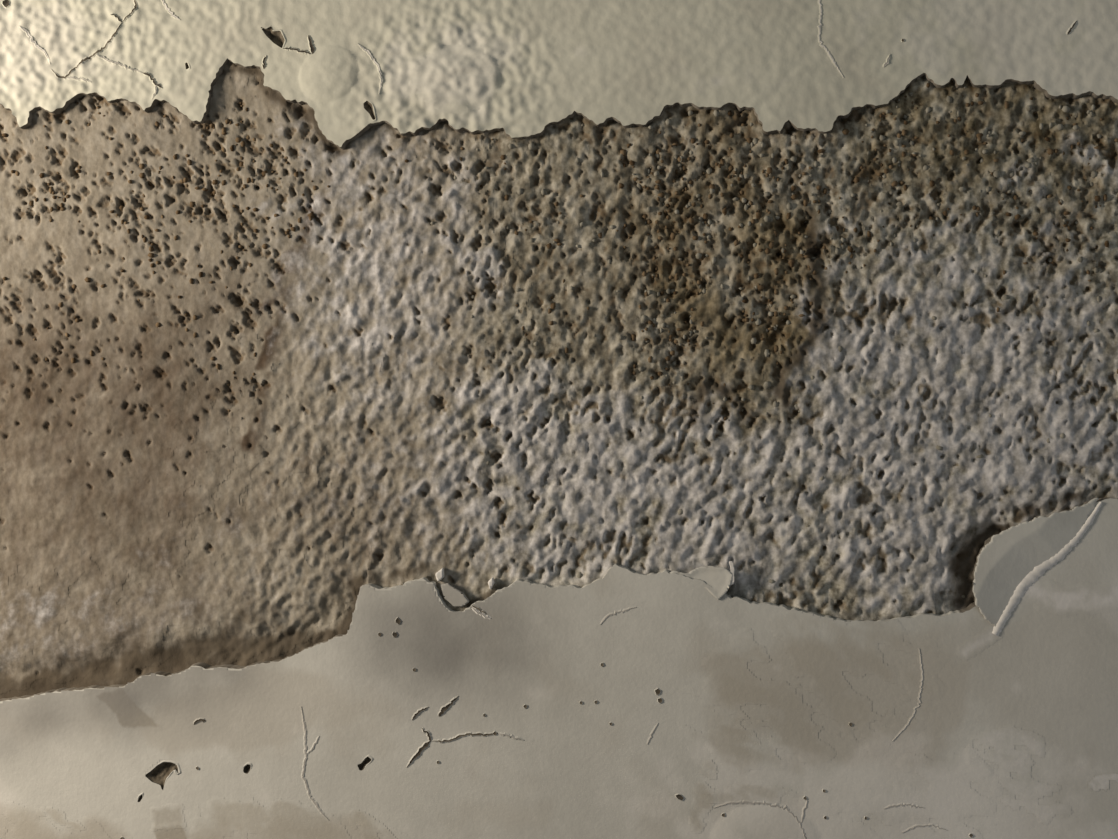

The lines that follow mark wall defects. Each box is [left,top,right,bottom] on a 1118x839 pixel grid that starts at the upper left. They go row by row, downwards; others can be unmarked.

peeling [365,101,377,121]
spalling [438,131,514,170]
spalling [27,172,70,222]
spalling [109,101,330,274]
spalling [618,86,1118,386]
leakage [0,61,614,839]
peeling [435,568,470,607]
peeling [670,561,735,600]
peeling [962,498,1102,636]
crack [406,695,524,768]